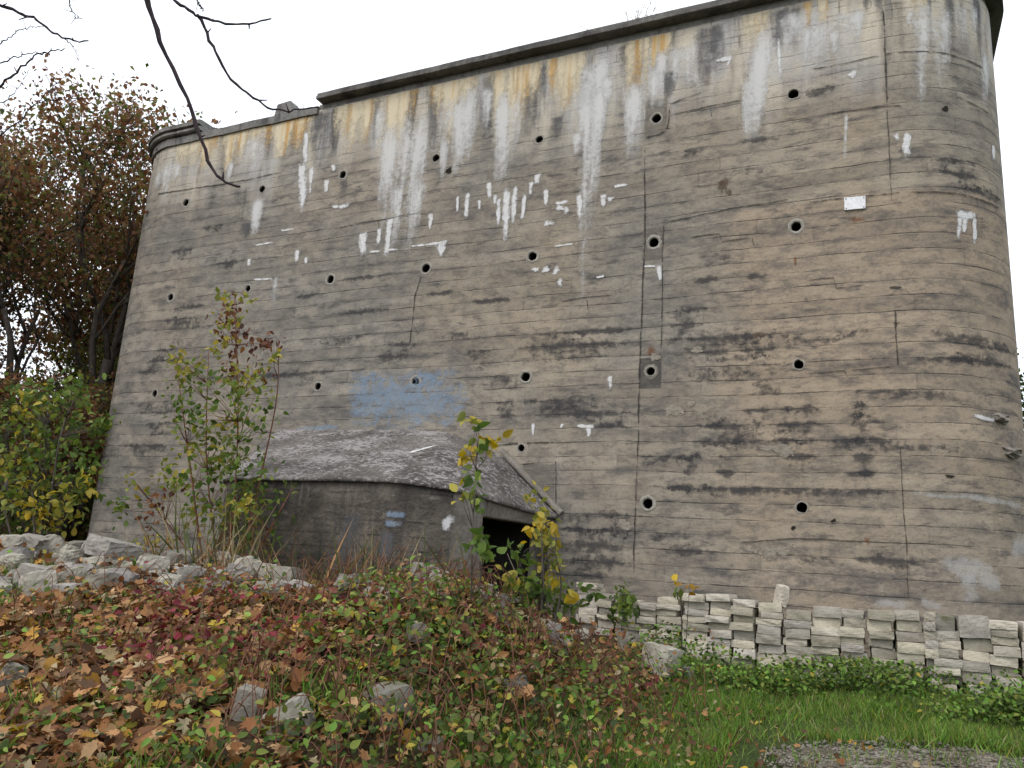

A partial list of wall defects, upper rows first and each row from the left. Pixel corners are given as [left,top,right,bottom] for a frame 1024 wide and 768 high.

rust [175,115,313,170]
damp [298,110,346,211]
rust [334,76,478,157]
damp [359,65,547,256]
rust [491,51,587,145]
damp [456,60,627,240]
rust [625,32,672,92]
damp [625,26,731,144]
crack [410,277,421,341]
crack [633,92,788,561]
damp [660,390,926,496]
crack [900,447,909,593]